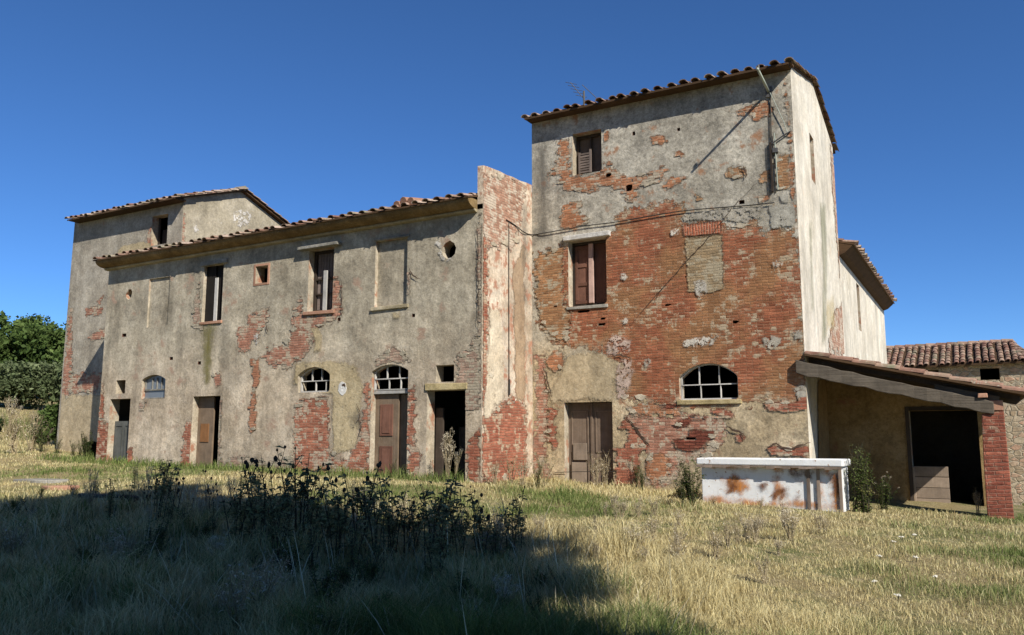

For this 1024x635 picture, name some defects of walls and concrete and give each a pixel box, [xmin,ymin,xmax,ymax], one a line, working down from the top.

flaking render [62,295,108,463]
flaking render [236,273,343,433]
flaking render [454,82,809,490]
flaking render [828,301,845,356]
flaking render [180,418,192,467]
flaking render [218,382,371,475]
corrosion [696,465,842,509]